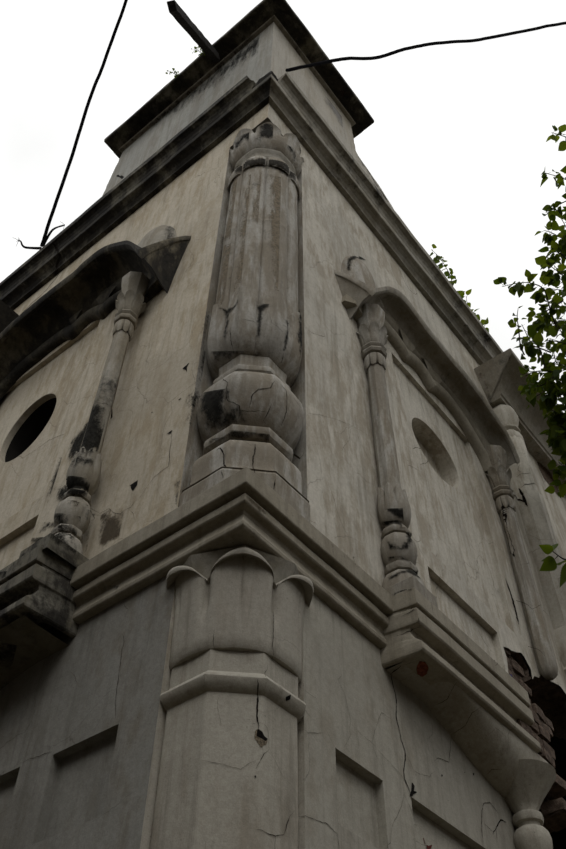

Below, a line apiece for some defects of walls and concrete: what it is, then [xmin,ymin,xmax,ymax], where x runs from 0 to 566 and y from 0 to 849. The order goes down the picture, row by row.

mould [68,405,104,464]
mould [50,462,90,501]
spalling [504,648,566,739]
crack [298,662,475,847]
crack [257,813,339,844]
crack [473,802,505,849]